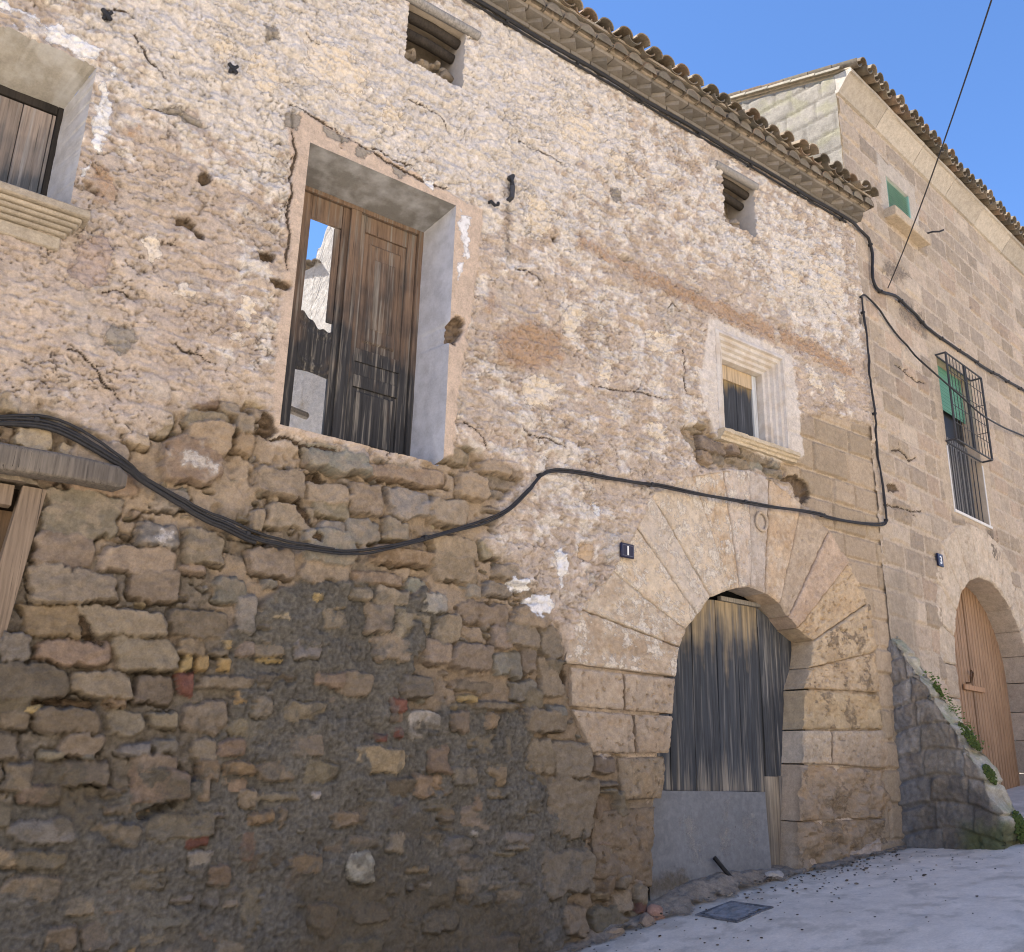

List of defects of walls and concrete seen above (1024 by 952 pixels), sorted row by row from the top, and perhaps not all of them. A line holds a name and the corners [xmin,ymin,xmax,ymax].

crack [106,8,166,79]
crack [281,104,447,270]
spalling [444,318,463,345]
crack [67,348,118,399]
crack [591,350,687,400]
spalling [780,474,809,504]
peeling [505,576,555,618]